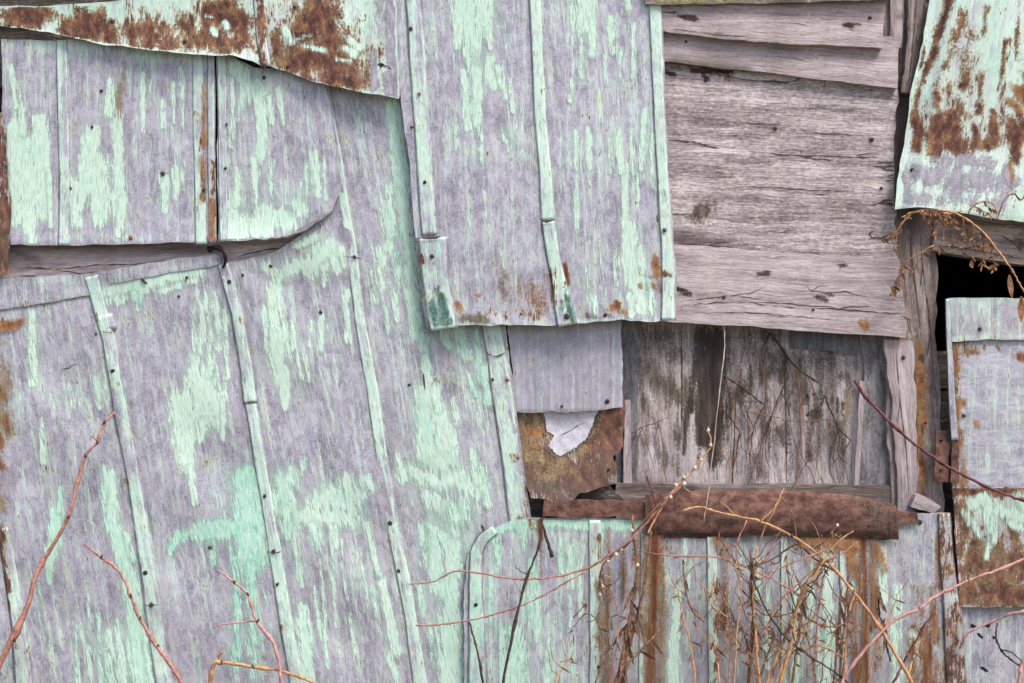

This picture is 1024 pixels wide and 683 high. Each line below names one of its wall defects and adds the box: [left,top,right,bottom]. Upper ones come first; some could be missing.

peeling [5,64,53,244]
rust [0,0,256,55]
peeling [226,60,352,412]
rust [270,0,372,90]
rust [908,0,1024,183]
peeling [102,268,404,683]
peeling [282,0,493,683]
damp [639,325,858,477]
rust [952,343,1024,607]
peeling [74,463,155,683]
peeling [487,518,645,683]
rust [529,499,889,683]